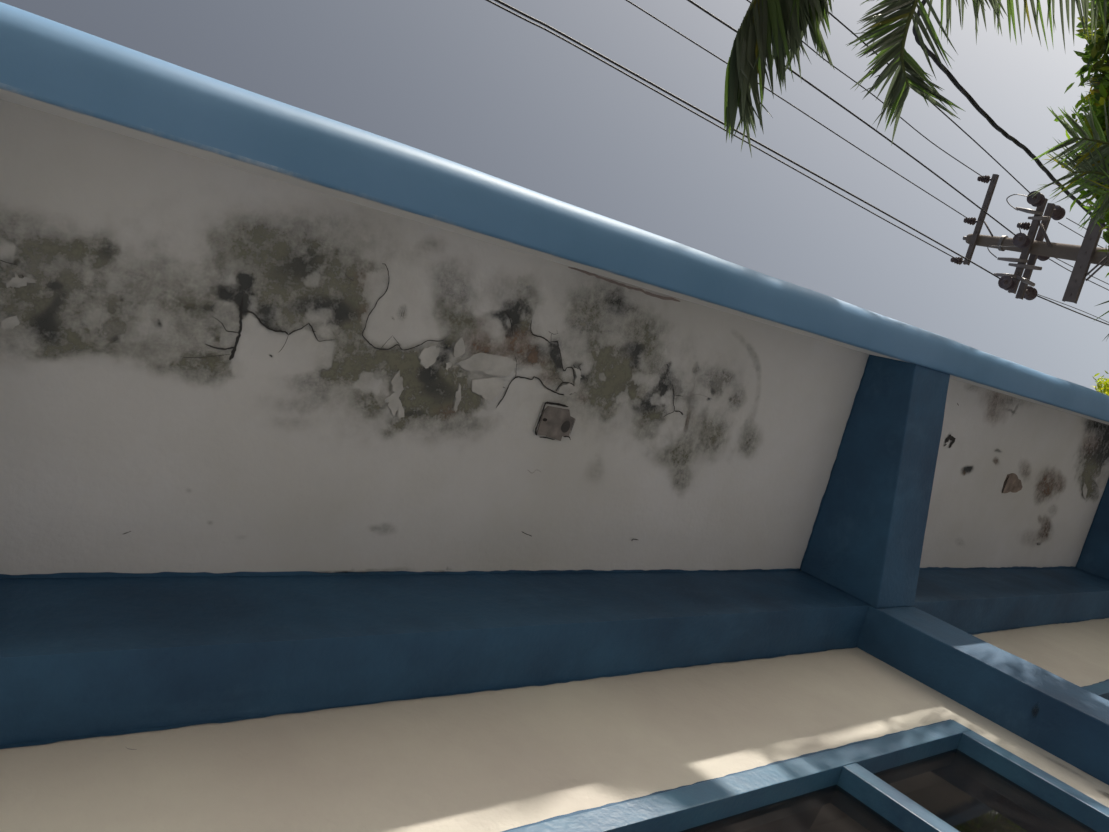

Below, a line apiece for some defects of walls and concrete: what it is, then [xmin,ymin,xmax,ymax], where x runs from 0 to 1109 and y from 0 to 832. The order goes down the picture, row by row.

peeling [2,272,37,288]
leakage [0,229,140,358]
crack [186,264,446,360]
peeling [384,370,405,418]
leakage [157,221,675,435]
peeling [419,338,516,412]
crack [497,311,582,406]
crack [568,267,680,302]
leakage [707,371,740,404]
leakage [1079,421,1109,498]